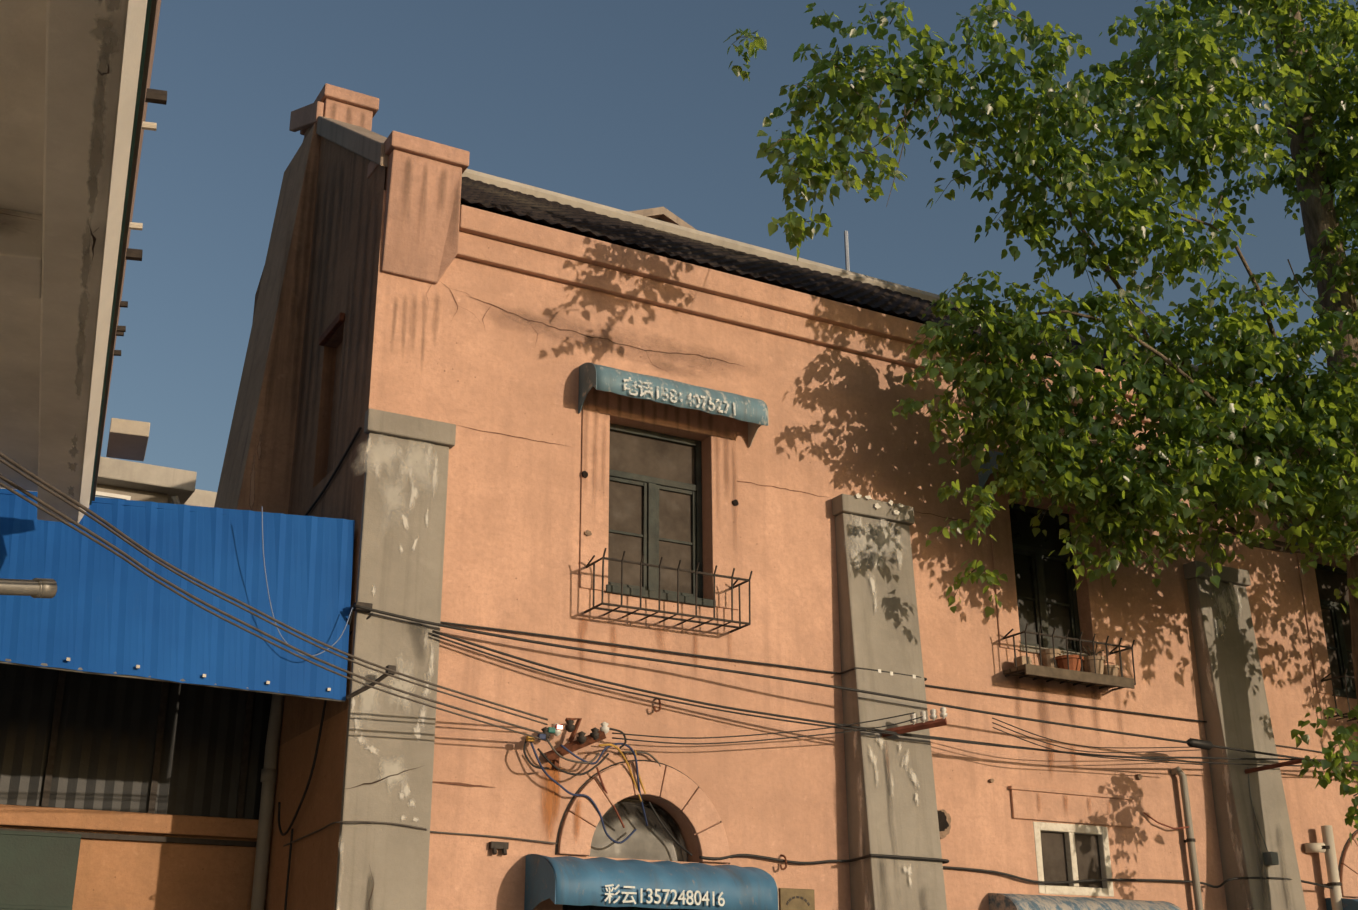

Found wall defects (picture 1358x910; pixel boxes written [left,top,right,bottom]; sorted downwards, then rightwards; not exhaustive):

crack [426,282,744,373]
peeling [853,493,904,609]
rust [544,761,559,828]